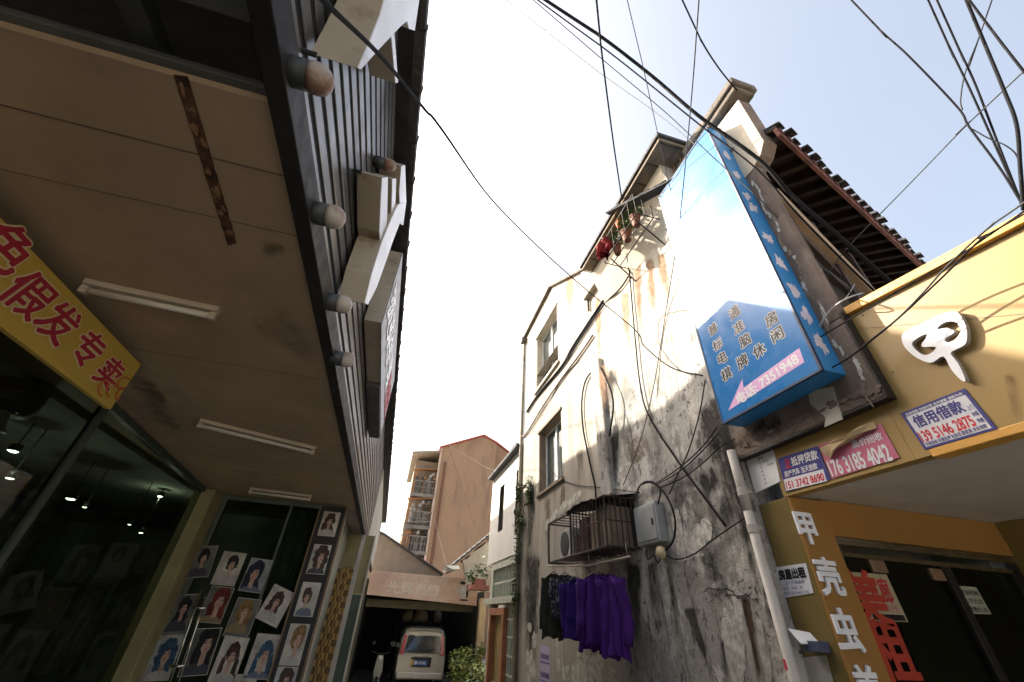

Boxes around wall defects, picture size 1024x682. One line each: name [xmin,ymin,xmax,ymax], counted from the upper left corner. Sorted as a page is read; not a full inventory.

rust [173,74,237,246]
leakage [604,424,619,474]
leakage [627,564,657,638]
leakage [668,573,710,672]